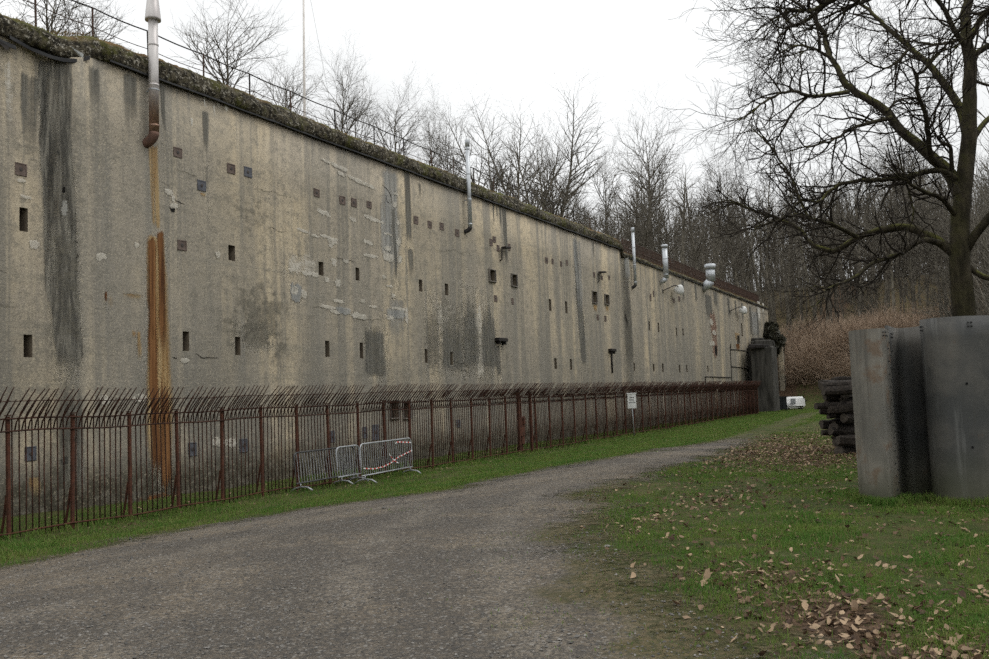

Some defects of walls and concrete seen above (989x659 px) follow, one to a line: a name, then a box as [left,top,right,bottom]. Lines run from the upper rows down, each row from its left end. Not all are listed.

water stain [5,60,83,361]
rust [124,146,172,500]
peeling [288,228,349,302]
peeling [320,275,408,323]
peeling [349,214,402,264]
water stain [61,394,84,483]